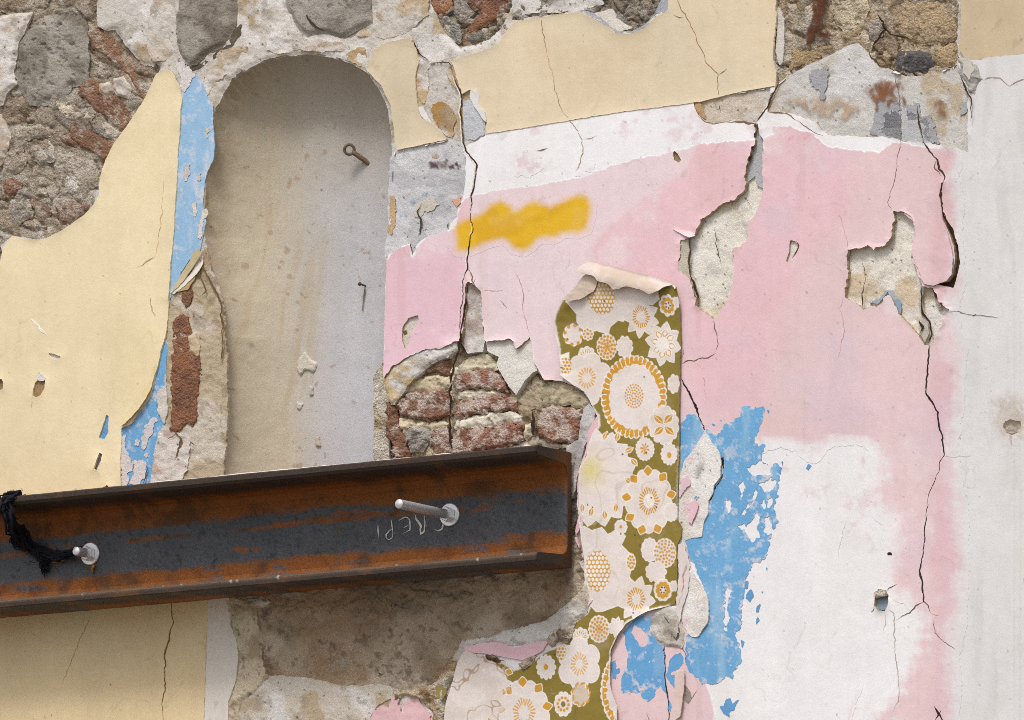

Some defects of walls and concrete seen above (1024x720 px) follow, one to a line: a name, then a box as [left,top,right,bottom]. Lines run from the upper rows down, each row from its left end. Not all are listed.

spalling [0,0,248,486]
crack [413,41,529,331]
crack [541,20,597,170]
flaking render [673,0,1023,349]
crack [888,78,997,318]
crack [162,604,174,711]
spalling [225,283,597,720]
peeling [611,406,783,720]
crack [898,347,971,650]